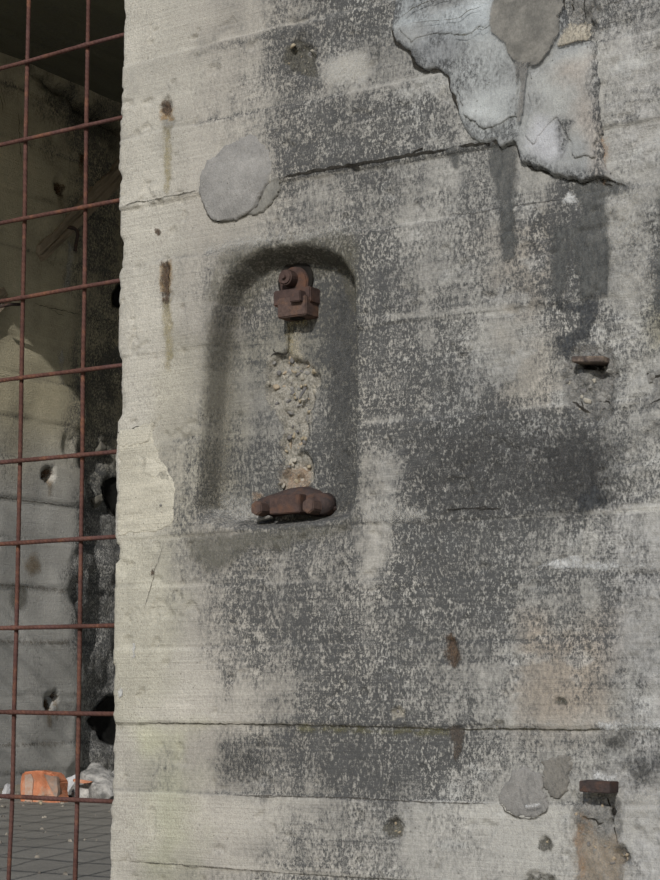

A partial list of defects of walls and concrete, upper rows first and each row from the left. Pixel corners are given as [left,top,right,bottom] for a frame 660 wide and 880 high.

peeling [392,0,618,183]
water stain [489,0,591,122]
water stain [446,147,459,168]
crack [279,140,626,206]
rust [160,259,171,359]
spalling [265,353,321,490]
crack [122,722,652,731]
spalling [573,793,629,880]